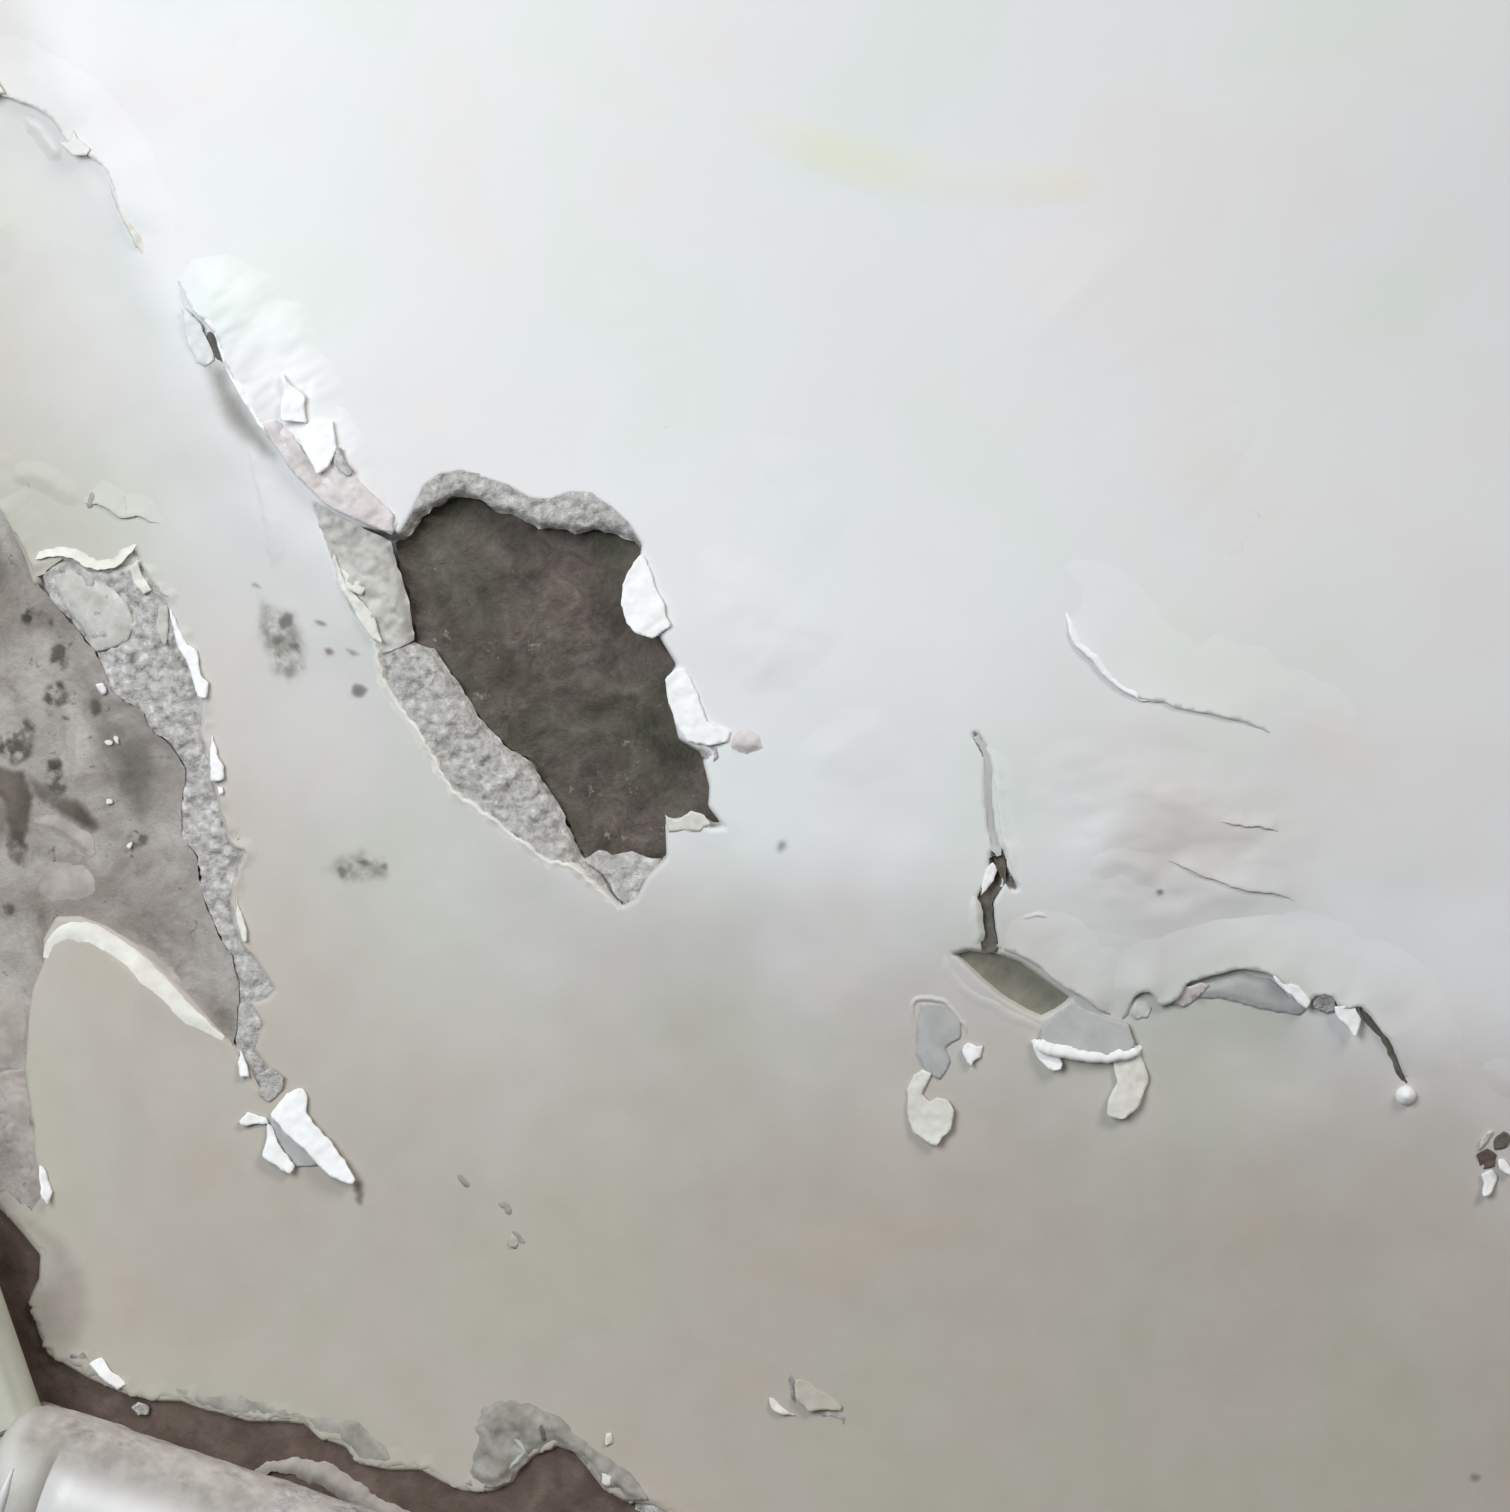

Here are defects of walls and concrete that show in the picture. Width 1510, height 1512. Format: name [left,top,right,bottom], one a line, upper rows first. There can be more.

spalling [178,254,763,911]
crack [1064,559,1357,734]
flaking render [0,446,695,1512]
peeling [907,909,1462,1146]